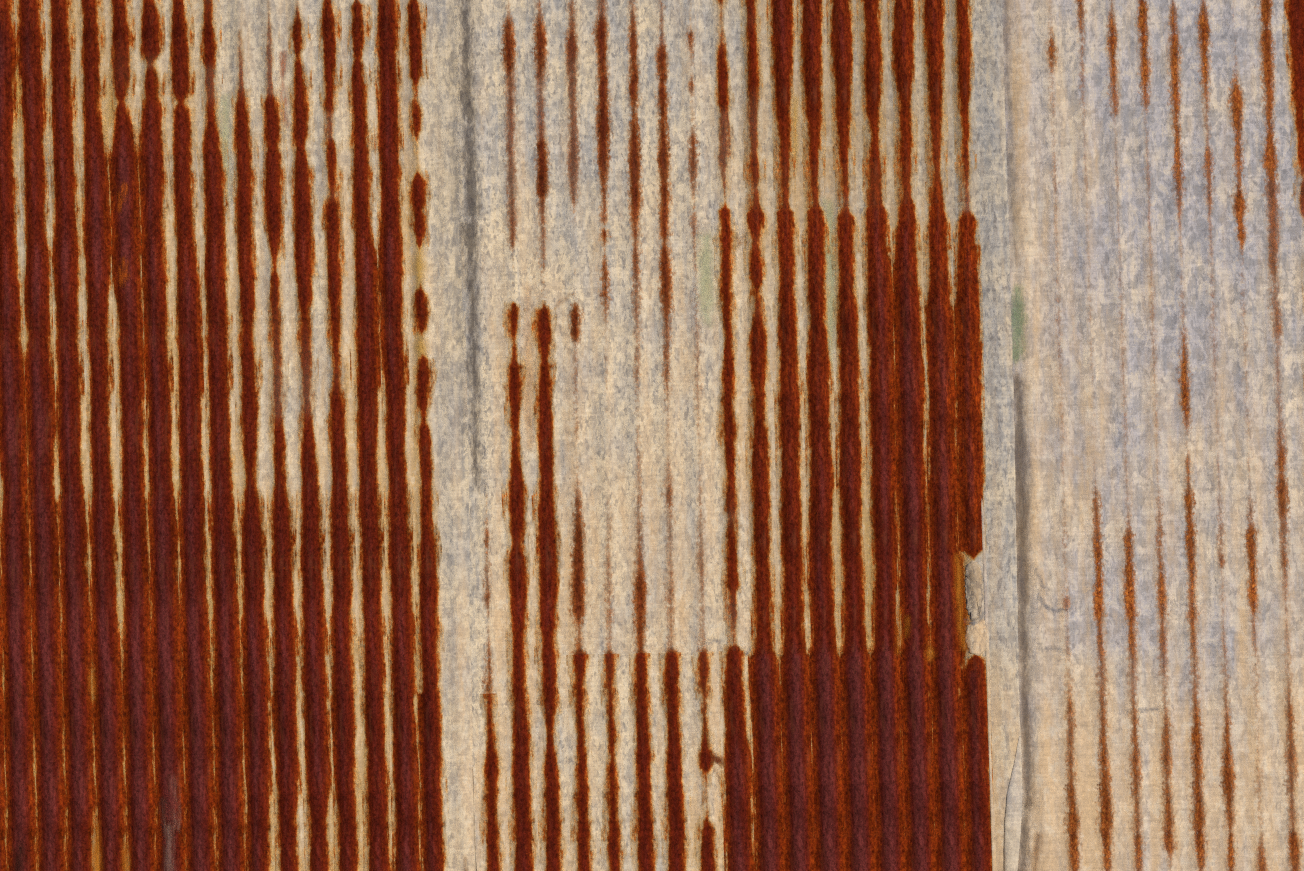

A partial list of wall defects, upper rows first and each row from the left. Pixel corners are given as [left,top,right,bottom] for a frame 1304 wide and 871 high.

corrosion [1169,1,1184,218]
corrosion [1228,77,1247,249]
corrosion [1260,0,1304,336]
corrosion [0,0,447,871]
corrosion [479,0,993,871]
corrosion [1064,690,1080,871]
corrosion [1092,489,1114,871]
corrosion [1123,526,1143,871]
corrosion [1160,707,1175,859]
corrosion [1184,454,1205,871]
corrosion [1220,686,1236,871]
corrosion [1286,687,1302,871]